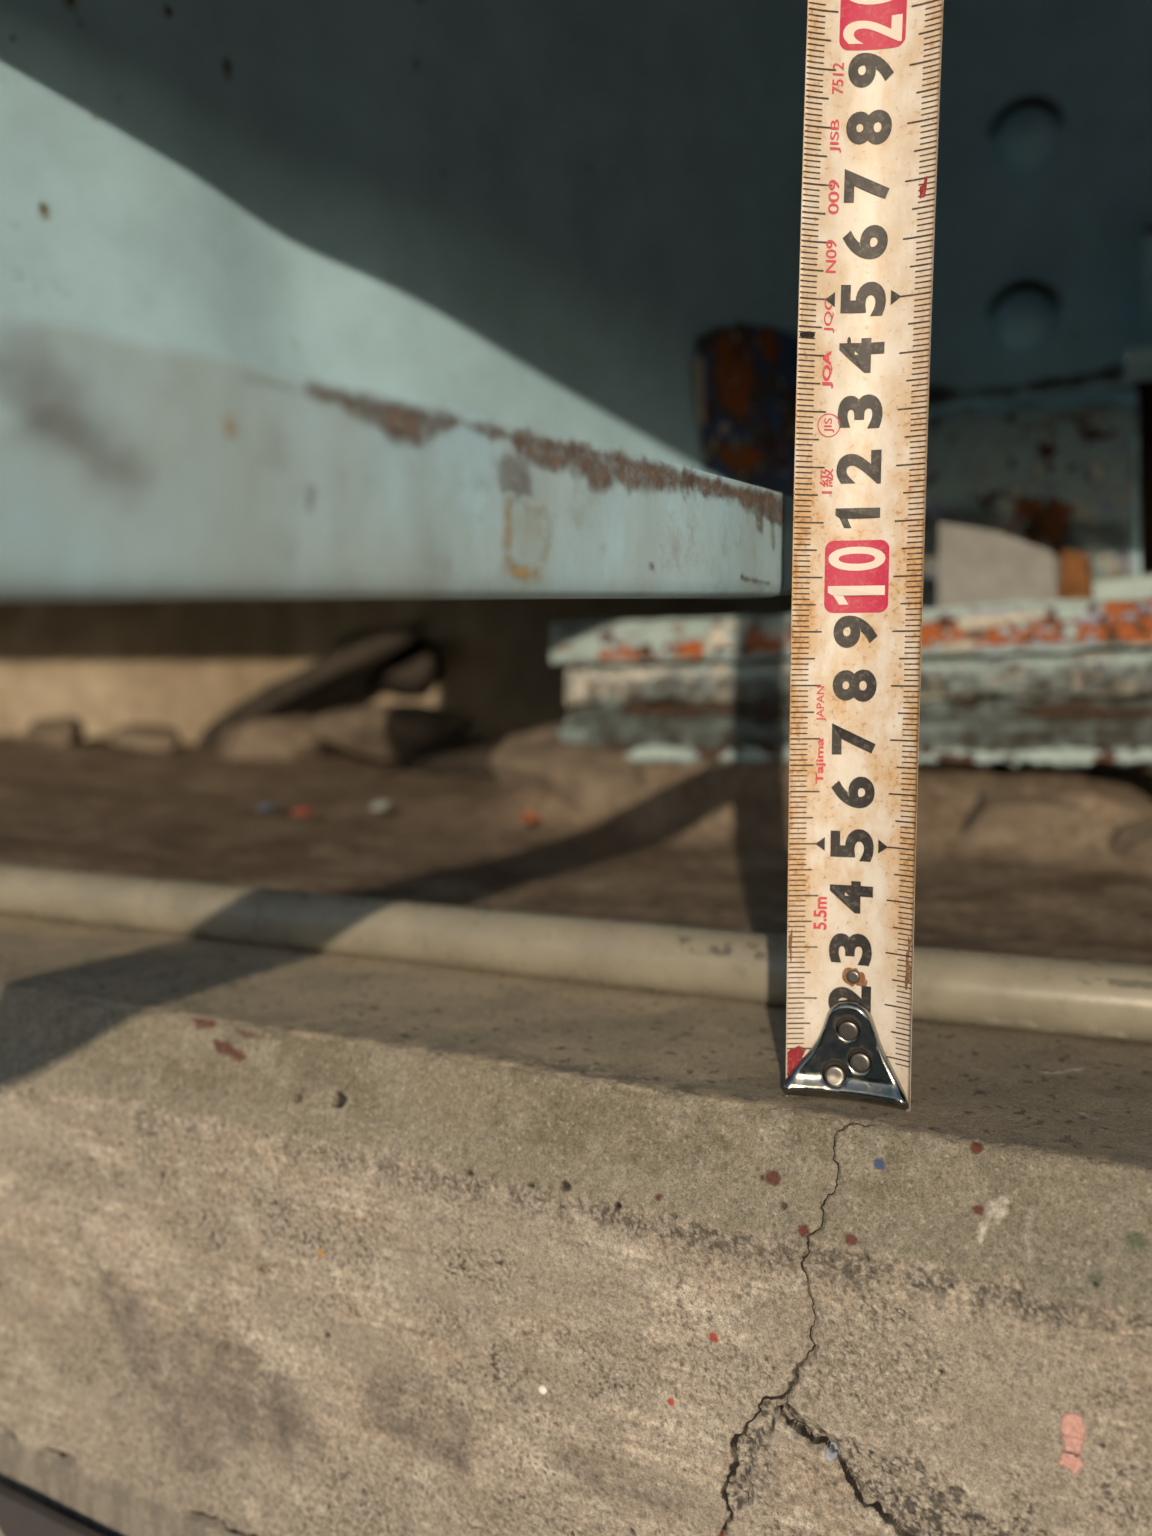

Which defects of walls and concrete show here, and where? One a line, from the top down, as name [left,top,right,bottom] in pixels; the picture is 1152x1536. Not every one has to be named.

crack [719,1122,870,1536]
crack [0,1423,76,1458]
crack [188,1511,257,1536]